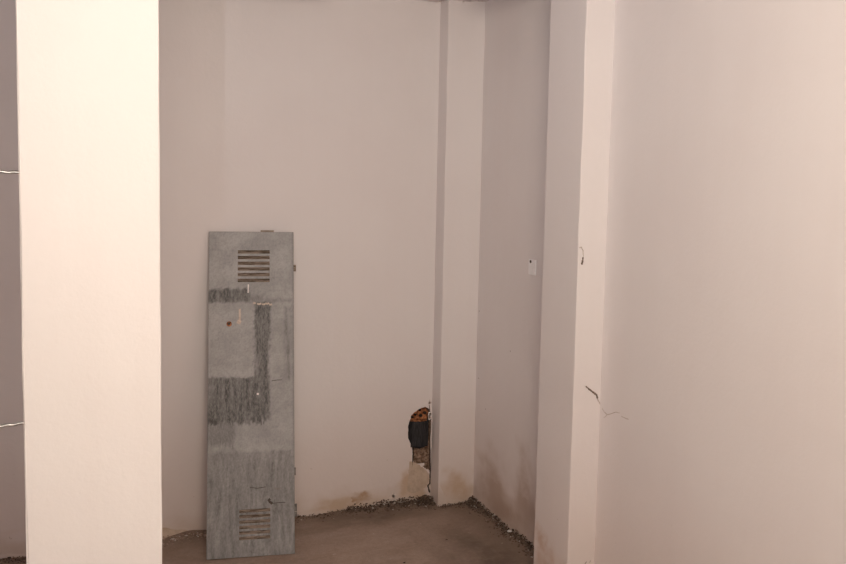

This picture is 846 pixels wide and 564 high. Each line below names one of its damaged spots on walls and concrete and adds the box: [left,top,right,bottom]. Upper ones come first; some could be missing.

spalling [410,400,432,422]
crack [586,386,629,420]
spalling [407,441,431,493]
water stain [295,426,567,564]